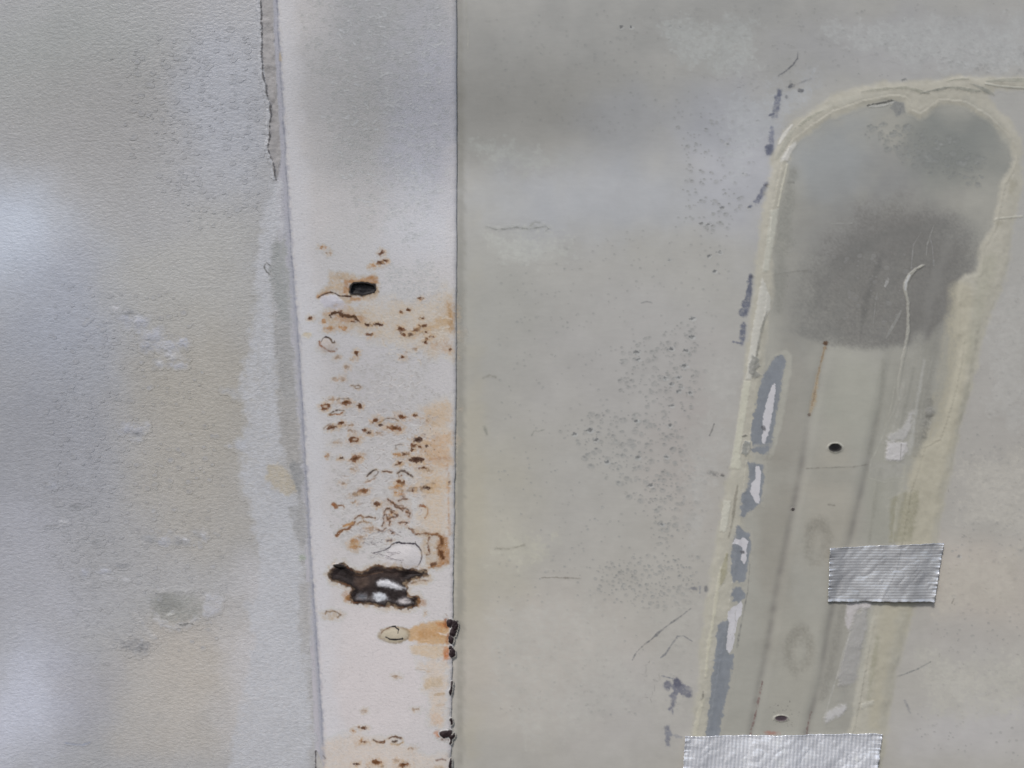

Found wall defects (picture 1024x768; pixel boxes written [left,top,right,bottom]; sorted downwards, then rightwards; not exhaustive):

crack [255,0,277,182]
rust [304,243,469,768]
peeling [700,347,794,737]